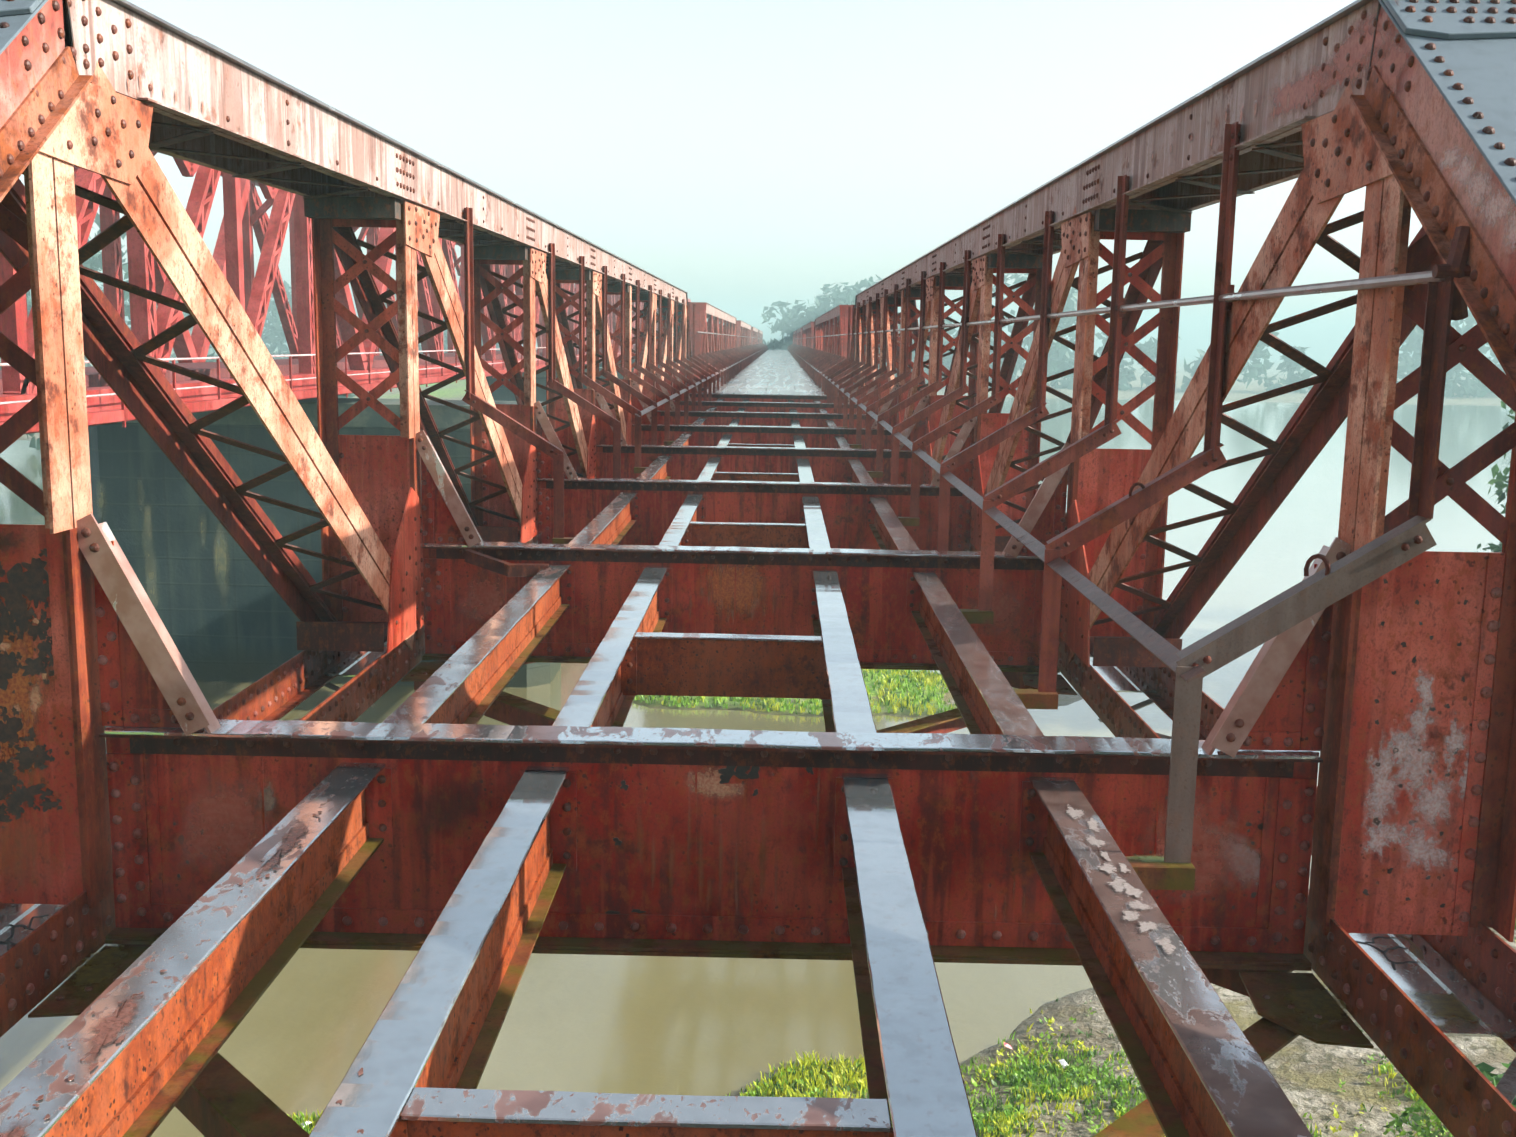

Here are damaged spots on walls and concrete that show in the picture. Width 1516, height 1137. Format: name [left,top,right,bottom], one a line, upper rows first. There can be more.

peeling [14,673,47,712]
peeling [688,766,760,798]
peeling [1366,642,1472,880]
peeling [238,811,322,892]
peeling [1066,804,1176,954]
peeling [68,992,143,1081]
peeling [0,1095,50,1137]